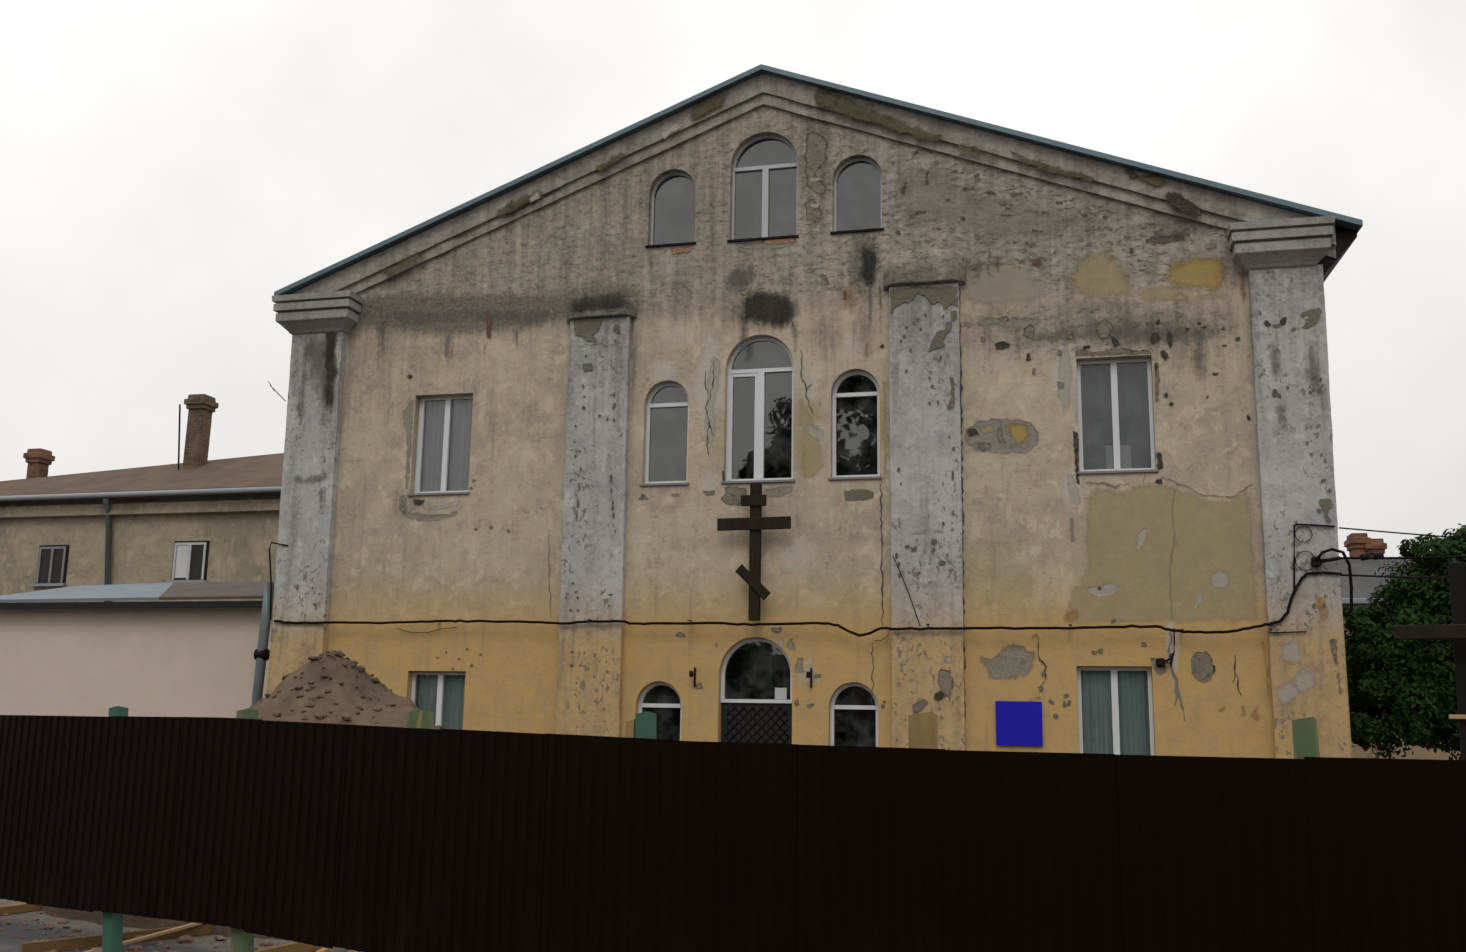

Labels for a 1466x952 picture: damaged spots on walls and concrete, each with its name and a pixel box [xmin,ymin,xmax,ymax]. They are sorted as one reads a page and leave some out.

damp [730,267,795,347]
damp [860,248,881,306]
peeling [1142,258,1225,300]
damp [300,332,337,412]
peeling [948,419,1038,453]
crack [1090,476,1253,721]
spalling [912,657,954,713]
peeling [981,645,1071,719]
spalling [1191,651,1215,683]
spalling [1277,642,1314,703]